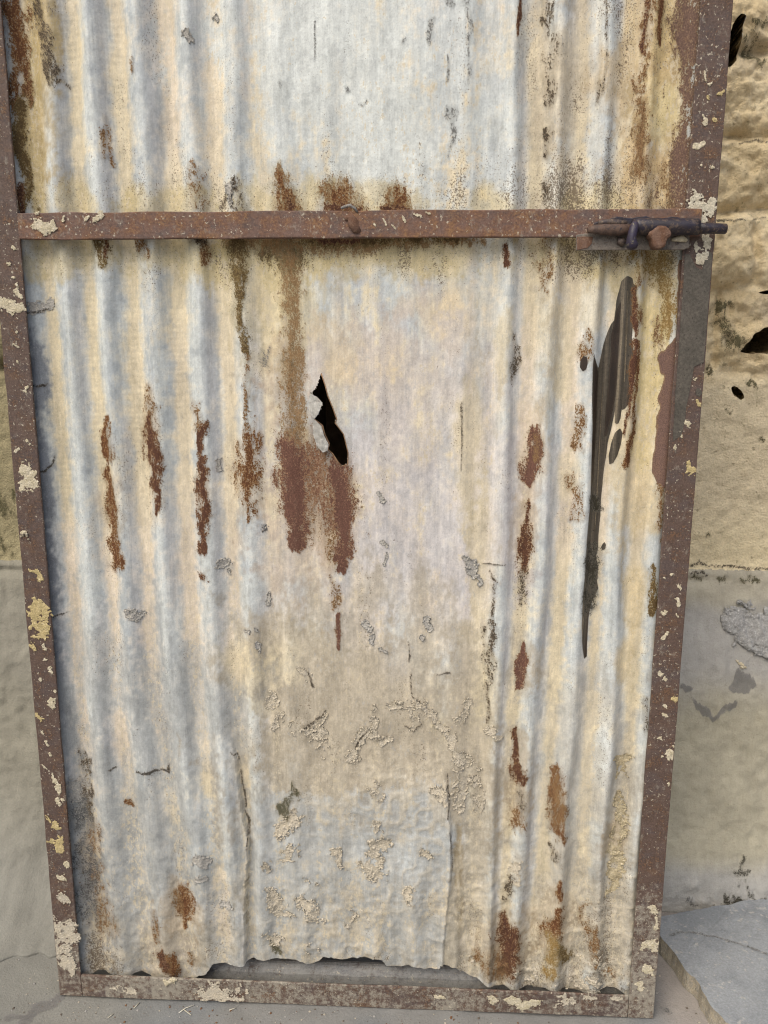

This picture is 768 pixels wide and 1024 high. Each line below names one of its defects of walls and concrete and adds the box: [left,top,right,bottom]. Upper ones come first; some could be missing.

rust [2,0,71,213]
rust [628,0,700,209]
rust [99,415,126,572]
rust [139,387,165,516]
rust [186,238,486,651]
rust [515,424,544,607]
leakage [580,276,637,659]
peeling [264,689,332,760]
peeling [344,697,486,815]
peeling [260,807,305,874]
peeling [264,876,326,925]
peeling [329,820,394,883]